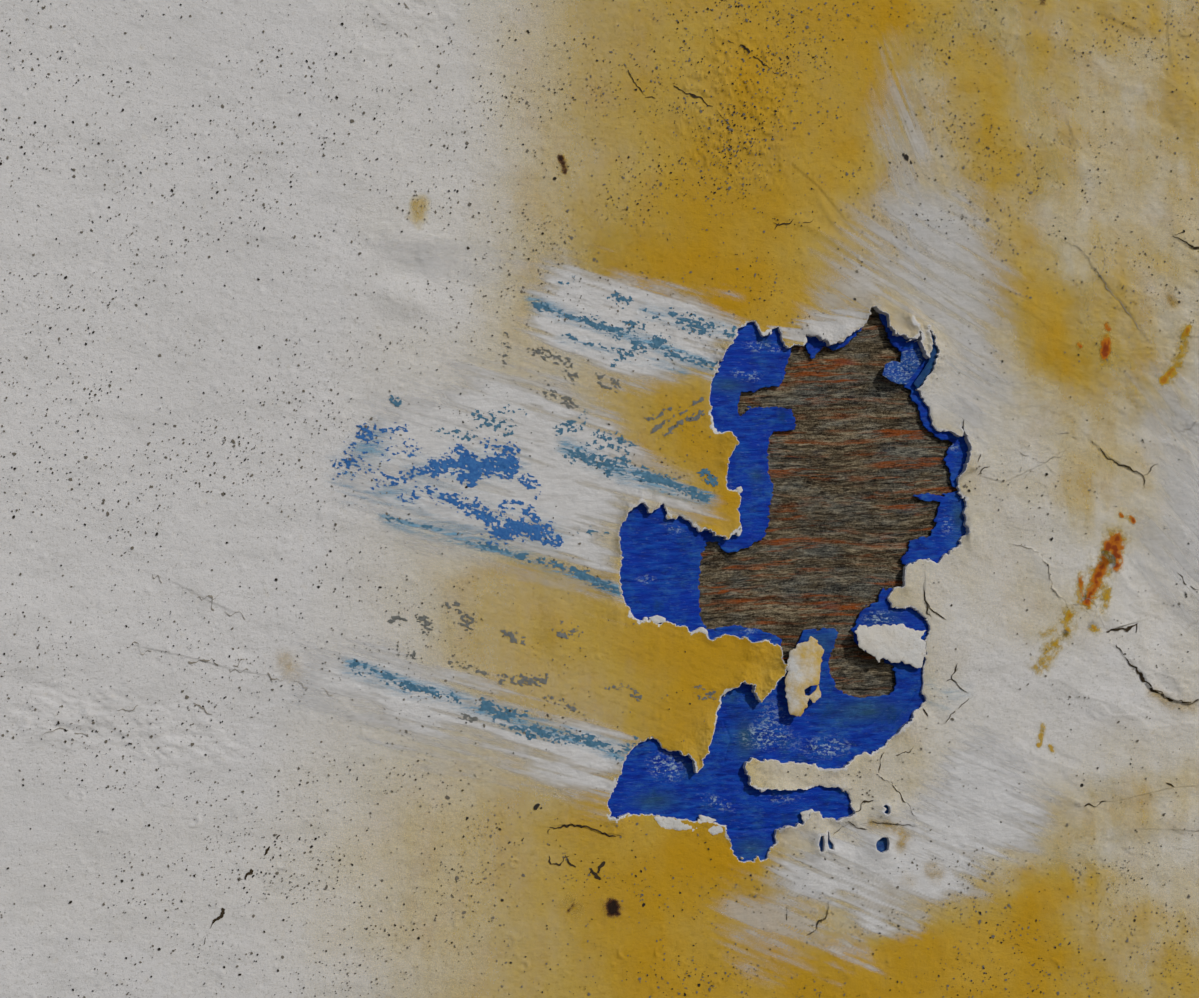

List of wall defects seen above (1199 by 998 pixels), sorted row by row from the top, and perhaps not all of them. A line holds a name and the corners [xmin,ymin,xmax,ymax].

rust [1100,323,1111,366]
rust [1159,324,1192,386]
crack [1016,432,1156,487]
peeling [608,308,968,862]
rust [1034,513,1136,673]
crack [1010,543,1199,703]